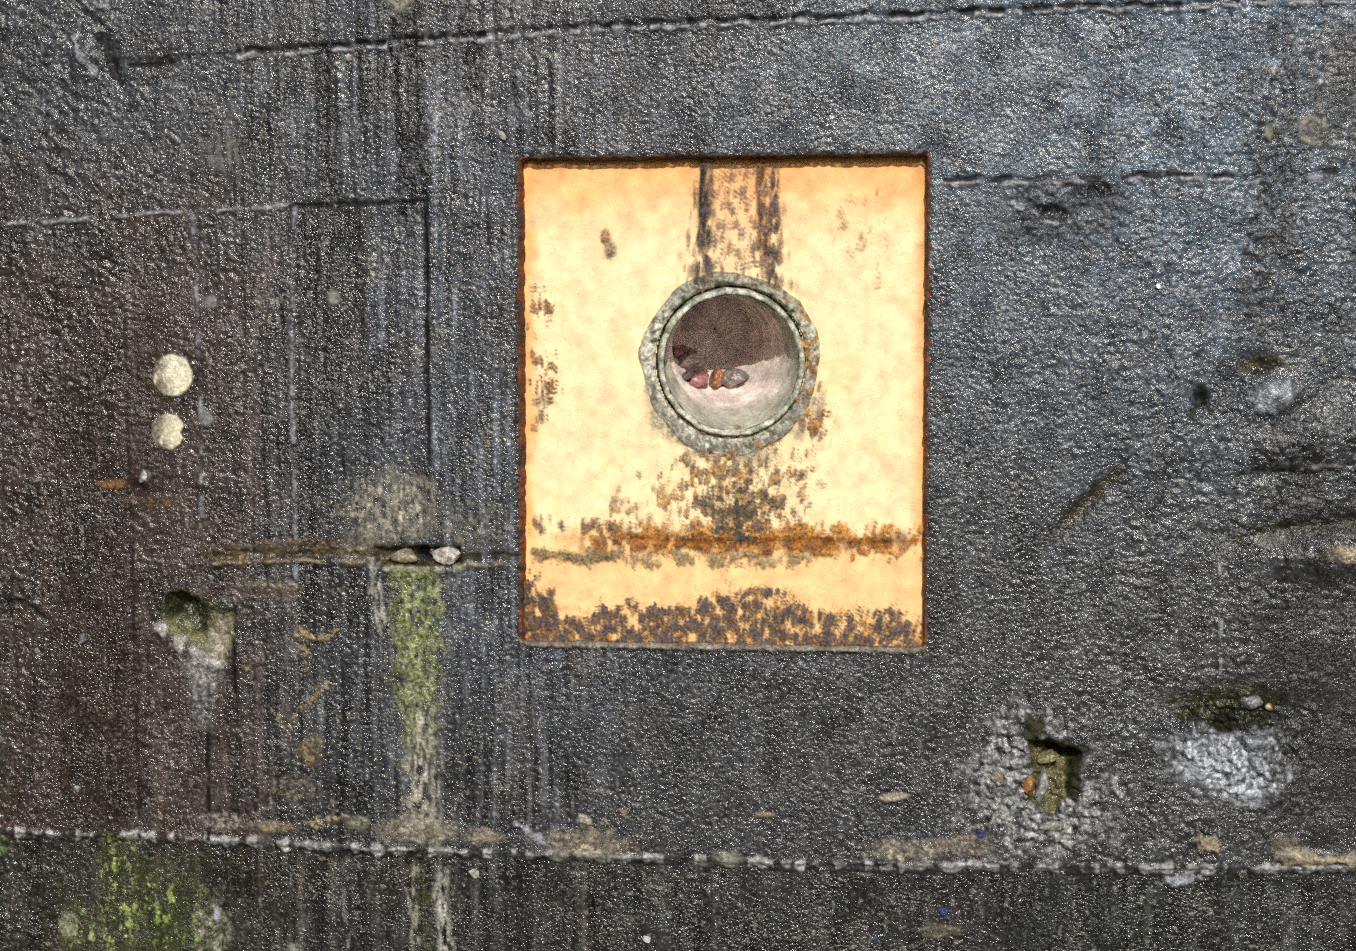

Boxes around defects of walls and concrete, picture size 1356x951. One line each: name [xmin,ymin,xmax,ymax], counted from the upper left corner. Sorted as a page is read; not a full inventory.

rust [516,150,931,653]
hole [153,590,238,729]
spalling [953,695,1122,860]
spalling [1171,673,1307,807]